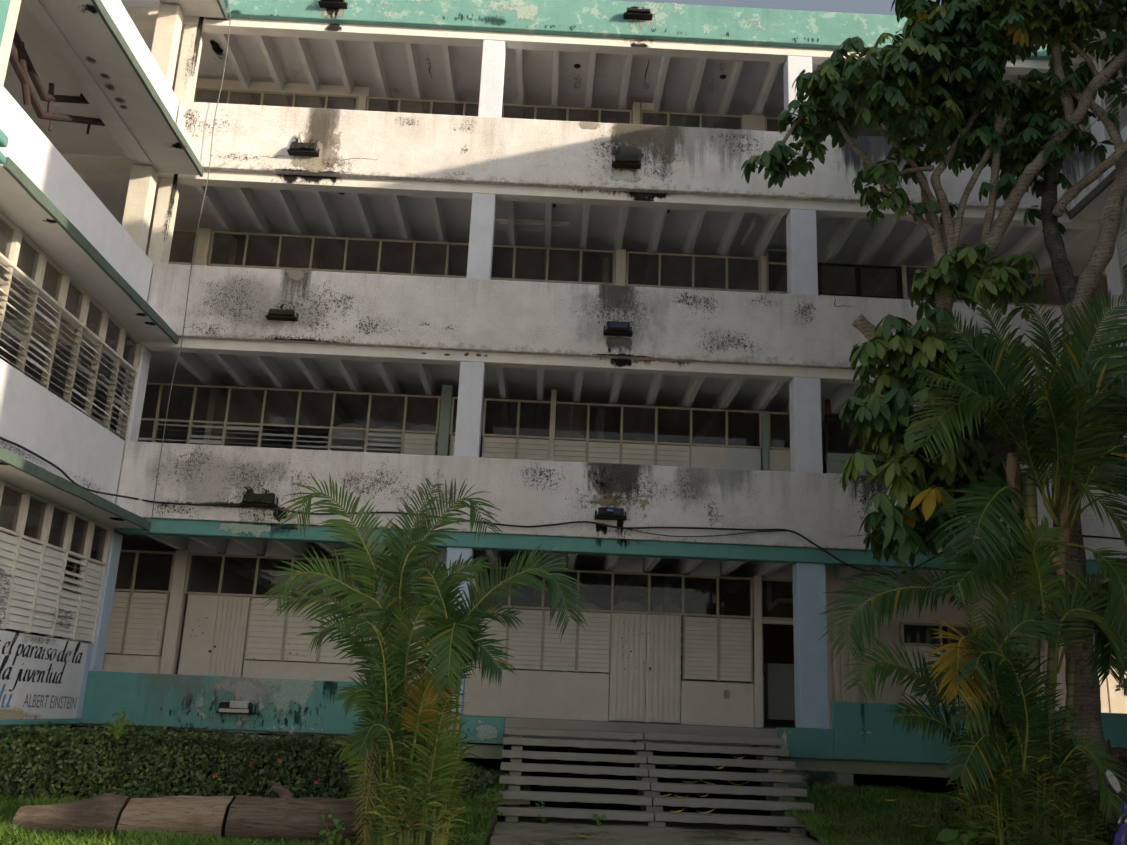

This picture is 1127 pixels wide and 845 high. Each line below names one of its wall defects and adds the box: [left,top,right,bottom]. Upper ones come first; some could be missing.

peeling [472,0,540,20]
damp [189,269,404,344]
damp [670,289,761,353]
damp [147,445,320,537]
damp [338,459,470,514]
damp [504,462,564,492]
peeling [153,677,327,734]